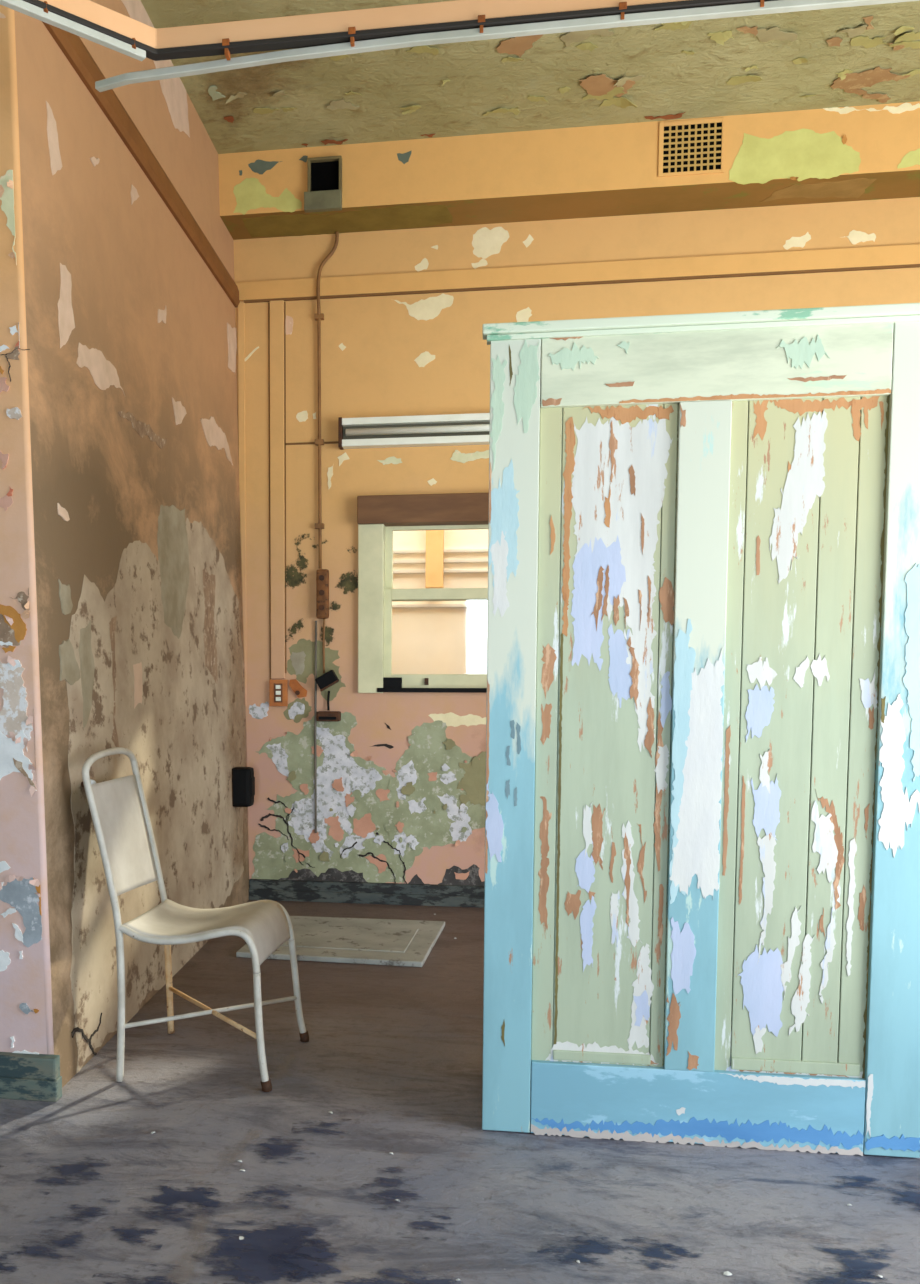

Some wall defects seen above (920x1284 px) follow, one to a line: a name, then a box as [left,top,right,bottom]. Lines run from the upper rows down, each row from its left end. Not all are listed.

peeling [153,60,190,138]
peeling [729,128,861,185]
peeling [392,294,454,321]
peeling [0,588,37,797]
flaking render [58,505,486,1073]
flaking render [0,861,42,972]
damp [254,1119,352,1163]
damp [361,1167,420,1210]
damp [833,1176,920,1210]
damp [0,1185,460,1284]
damp [537,1233,700,1271]
damp [795,1244,892,1284]